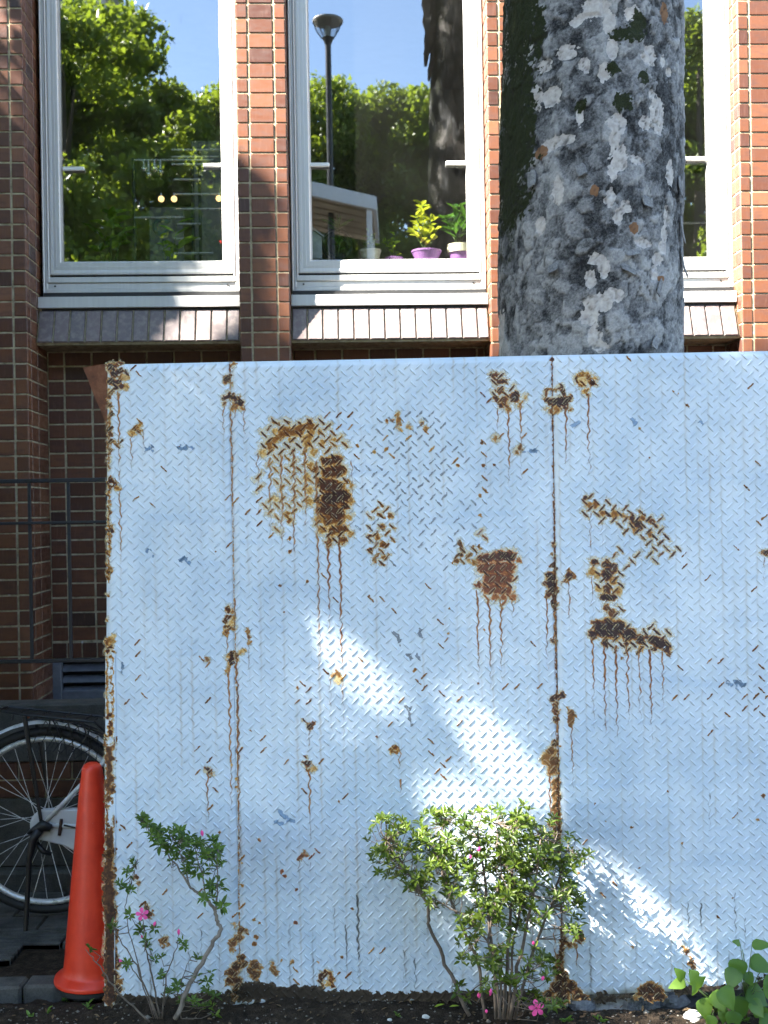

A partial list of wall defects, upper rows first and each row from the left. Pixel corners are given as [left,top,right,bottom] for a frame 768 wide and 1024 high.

rust [105,361,144,597]
rust [478,371,529,498]
rust [103,617,117,655]
rust [215,361,397,1002]
rust [452,513,522,673]
rust [530,357,690,861]
rust [724,645,768,717]
rust [542,904,767,1006]